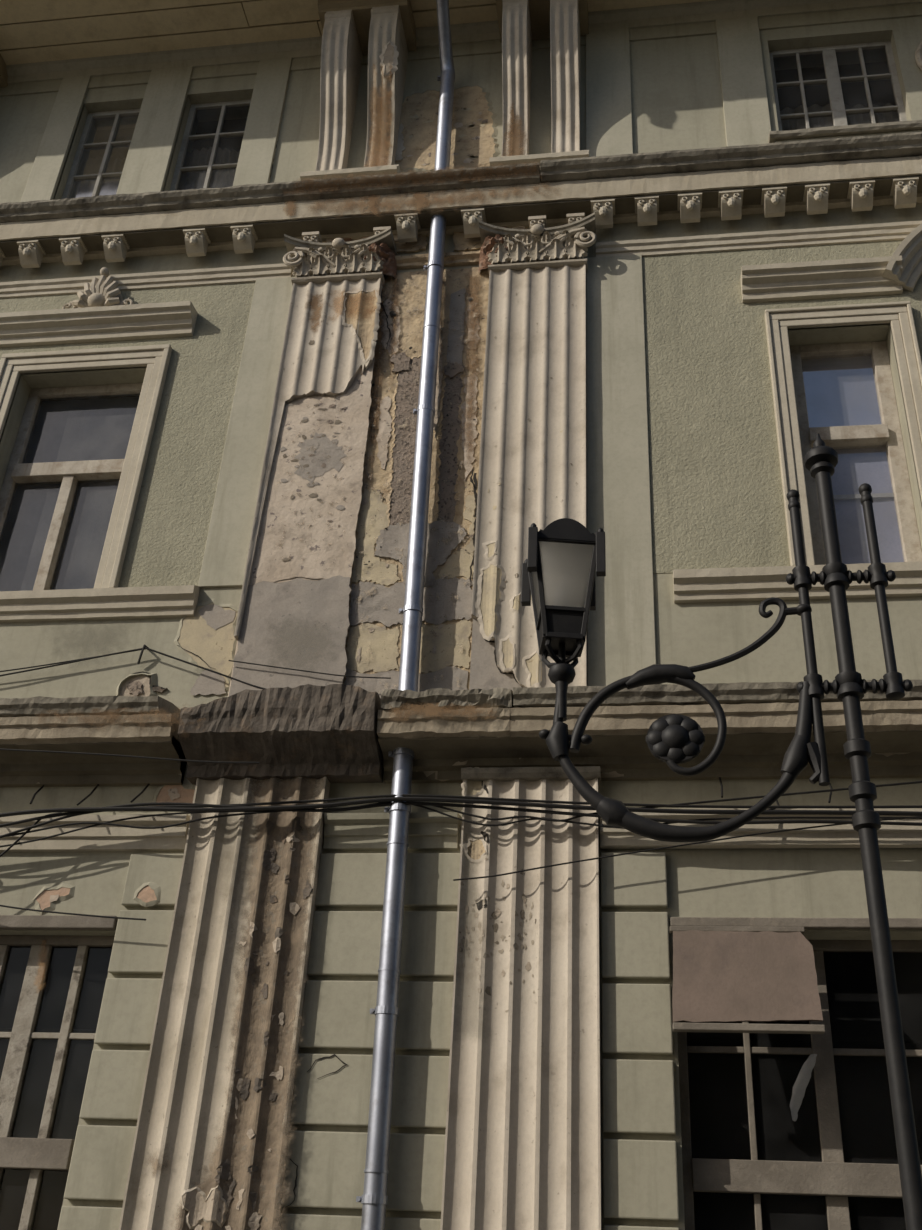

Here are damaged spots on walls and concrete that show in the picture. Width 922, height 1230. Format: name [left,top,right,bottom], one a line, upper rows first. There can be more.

spalling [379,40,399,79]
corrosion [284,71,547,216]
peeling [395,84,500,173]
spalling [249,234,428,686]
peeling [419,226,546,690]
spalling [116,671,168,696]
peeling [32,883,75,915]
water stain [176,776,318,1230]